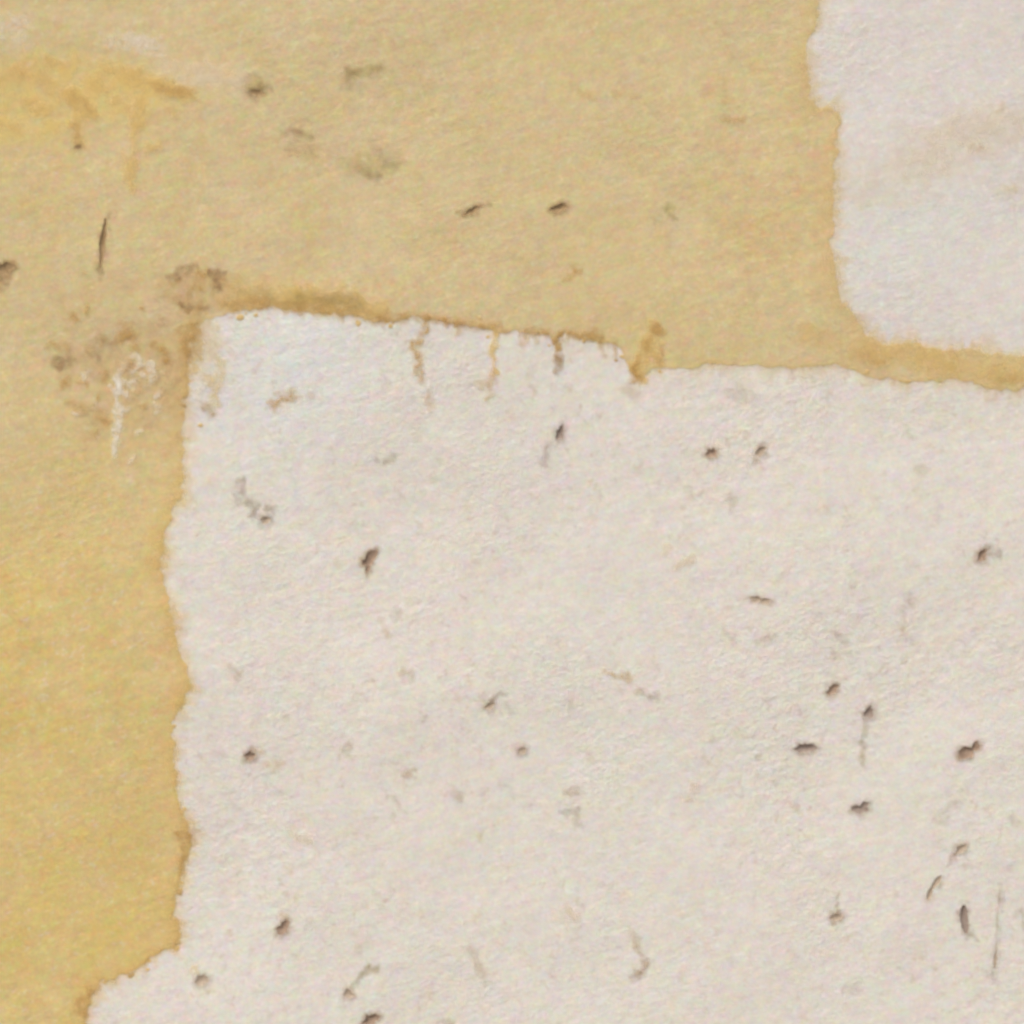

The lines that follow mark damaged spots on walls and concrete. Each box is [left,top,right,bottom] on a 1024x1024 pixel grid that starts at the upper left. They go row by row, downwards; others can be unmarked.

leakage [238,285,387,319]
peeling [805,0,1024,357]
peeling [84,305,1024,1024]